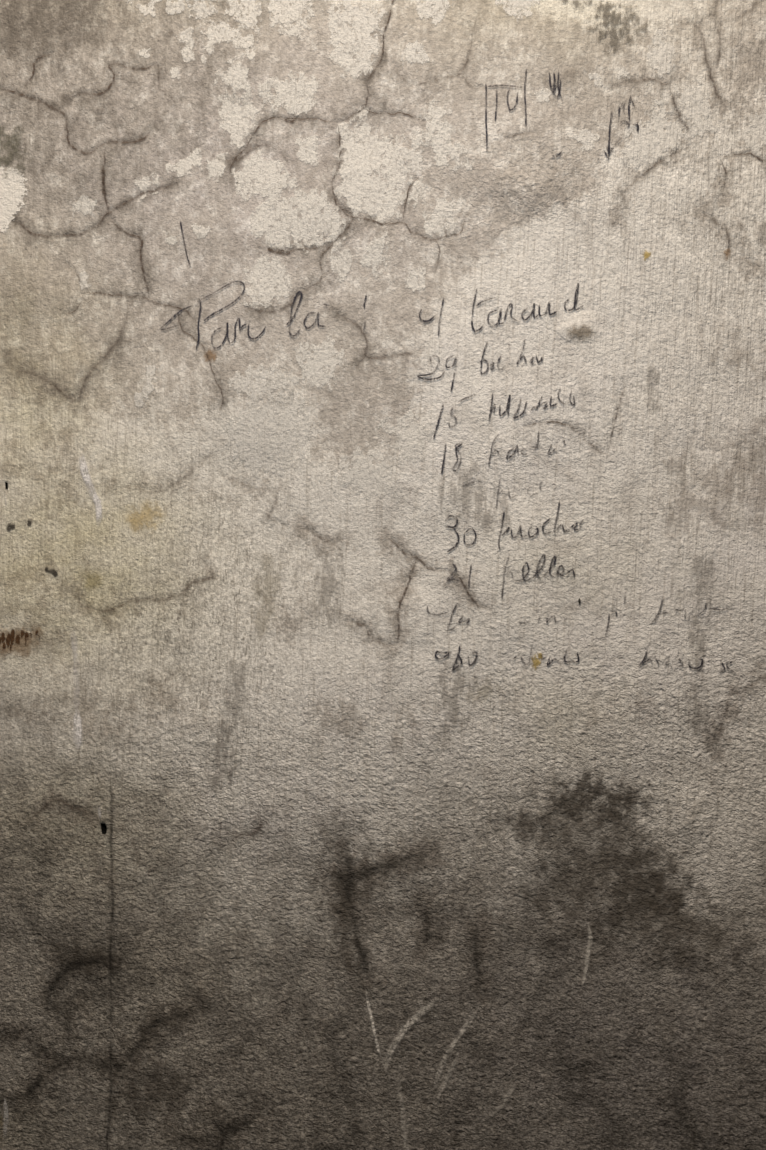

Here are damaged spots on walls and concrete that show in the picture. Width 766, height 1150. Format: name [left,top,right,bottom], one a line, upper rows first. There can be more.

peeling [495,0,541,22]
peeling [127,0,472,312]
crack [230,0,463,285]
peeling [534,86,551,102]
peeling [573,129,600,151]
peeling [72,195,97,215]
crack [8,55,223,397]
peeling [222,335,347,477]
peeling [338,407,432,503]
crack [393,542,433,638]
rust [0,629,40,650]
damp [559,776,645,823]